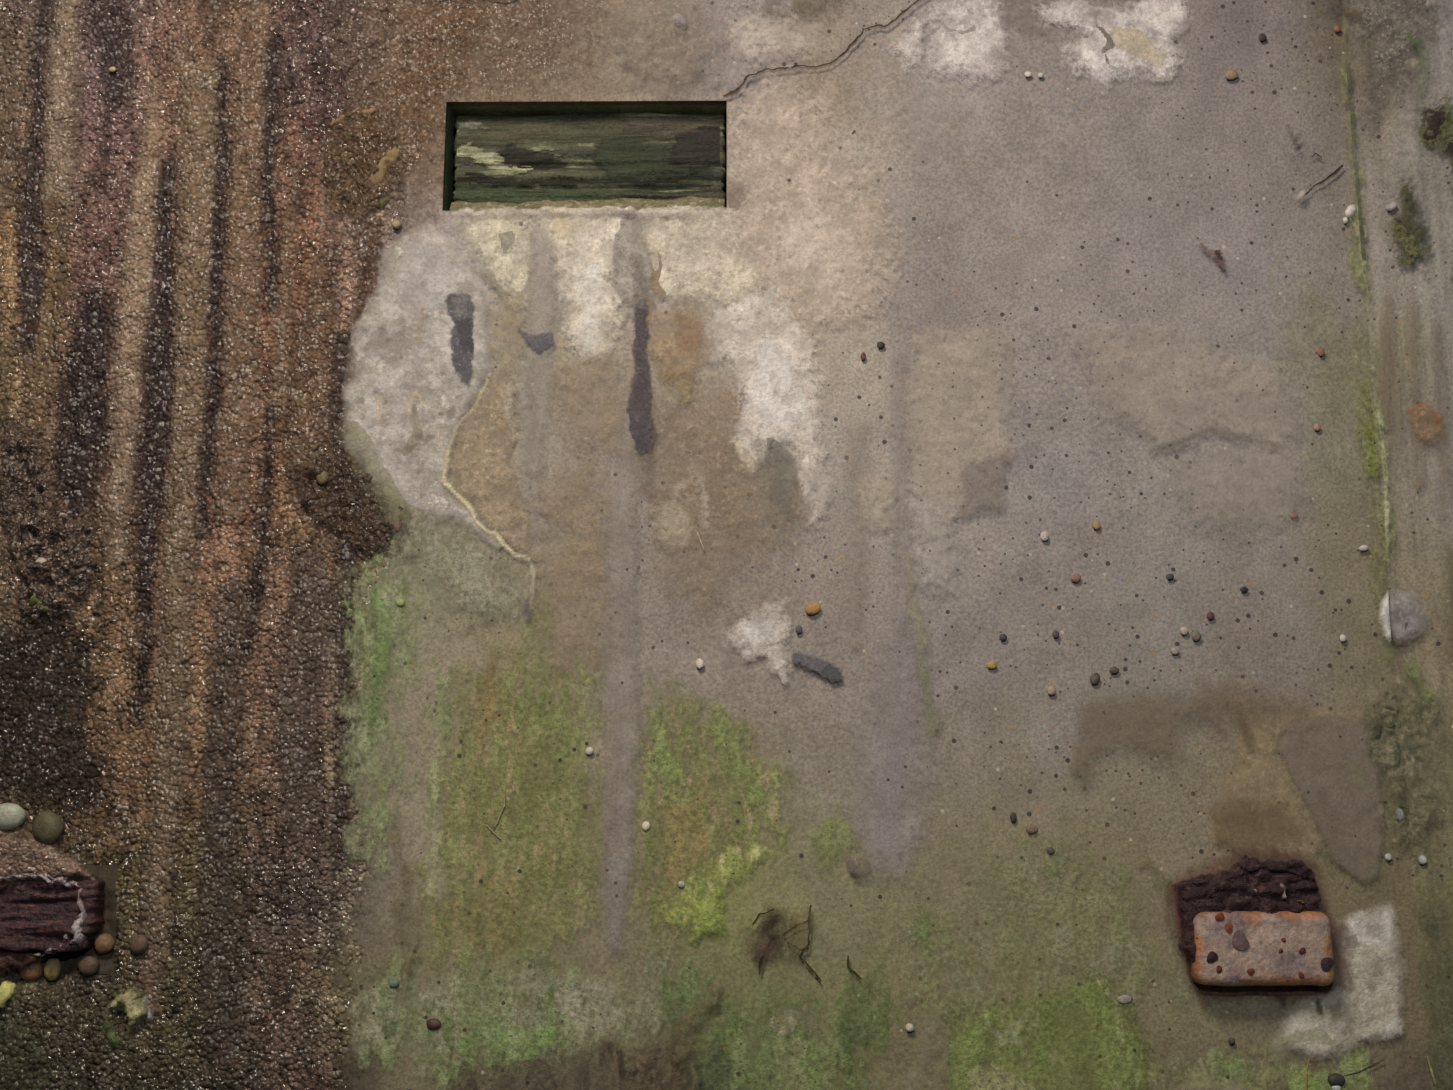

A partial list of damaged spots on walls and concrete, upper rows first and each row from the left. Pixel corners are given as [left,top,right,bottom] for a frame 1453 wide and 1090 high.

crack [723,0,919,97]
water stain [894,0,1187,85]
peeling [286,235,546,593]
water stain [445,82,889,949]
water stain [855,639,930,872]
corrosion [1169,846,1350,1014]